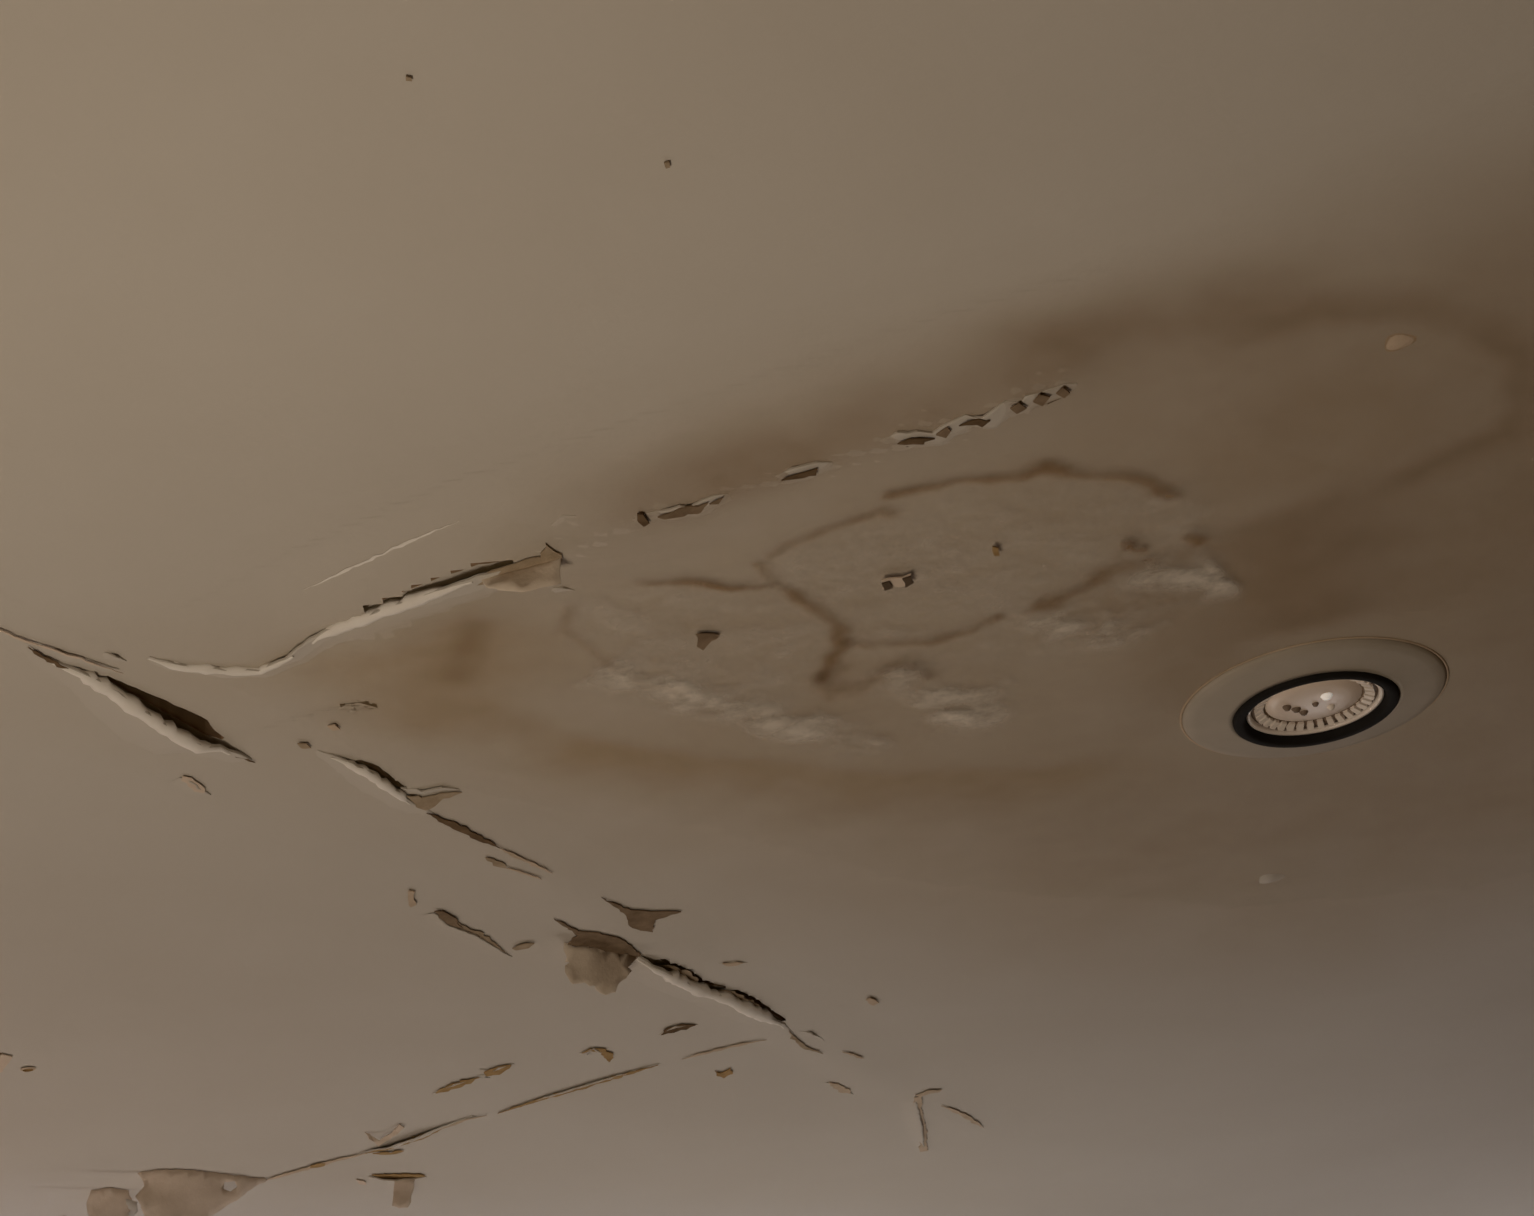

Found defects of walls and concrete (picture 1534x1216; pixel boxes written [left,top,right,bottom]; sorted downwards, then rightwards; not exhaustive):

crack [0,515,580,764]
crack [297,724,552,880]
peeling [554,897,681,995]
crack [267,956,864,1180]
peeling [86,1169,267,1216]
peeling [356,1173,427,1208]